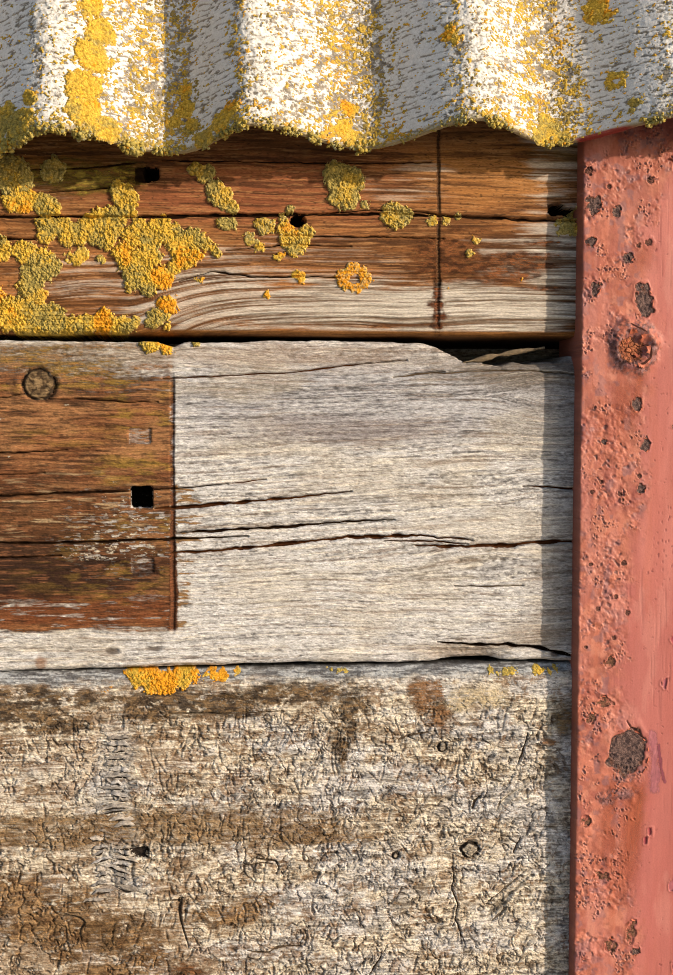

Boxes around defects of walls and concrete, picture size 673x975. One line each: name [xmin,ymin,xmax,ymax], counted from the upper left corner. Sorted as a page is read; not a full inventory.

corrosion [584,195,622,218]
corrosion [591,280,602,297]
corrosion [635,282,655,318]
corrosion [630,397,643,413]
crack [0,450,127,497]
crack [0,479,572,558]
crack [441,642,571,656]
corrosion [583,695,615,724]
corrosion [599,727,649,805]
corrosion [605,919,641,956]